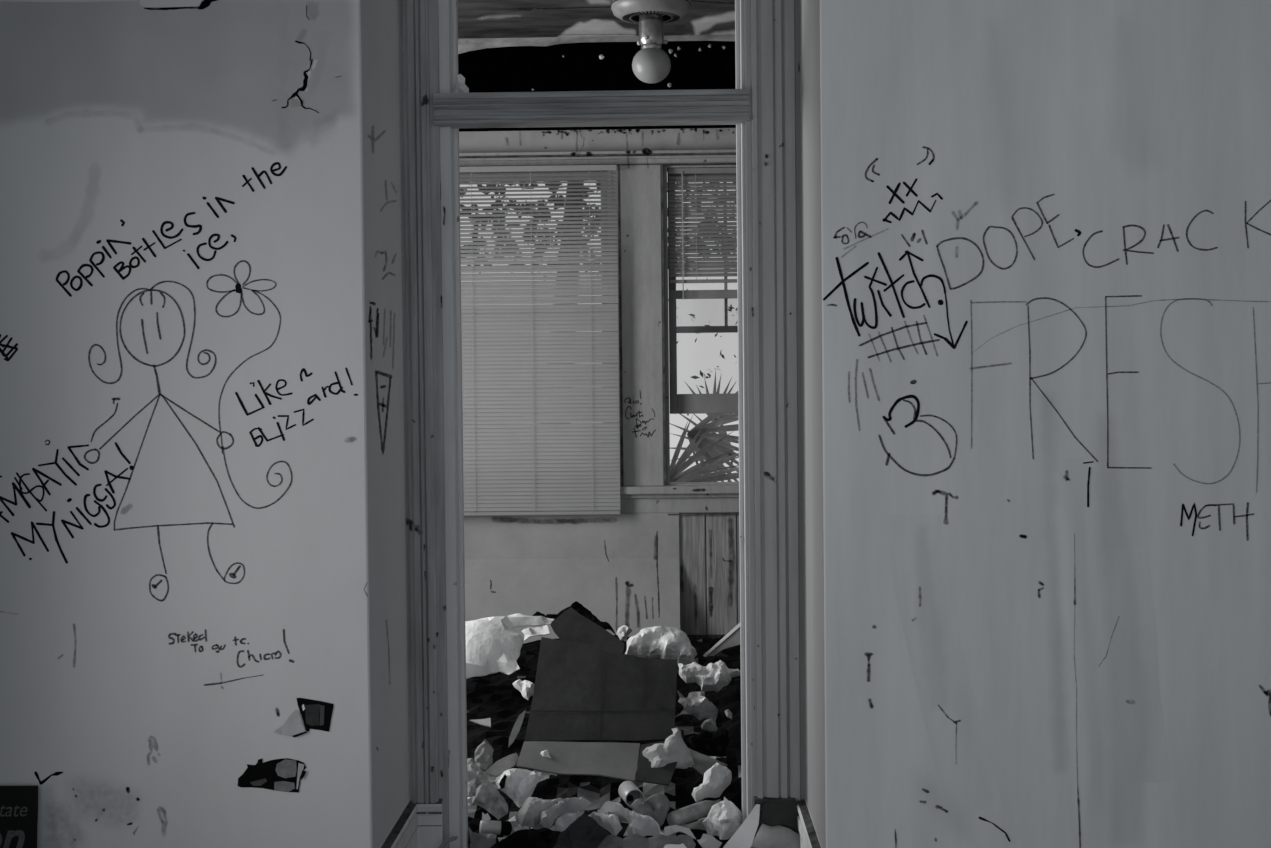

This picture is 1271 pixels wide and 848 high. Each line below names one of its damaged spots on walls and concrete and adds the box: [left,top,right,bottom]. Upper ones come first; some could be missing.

crack [272,40,341,113]